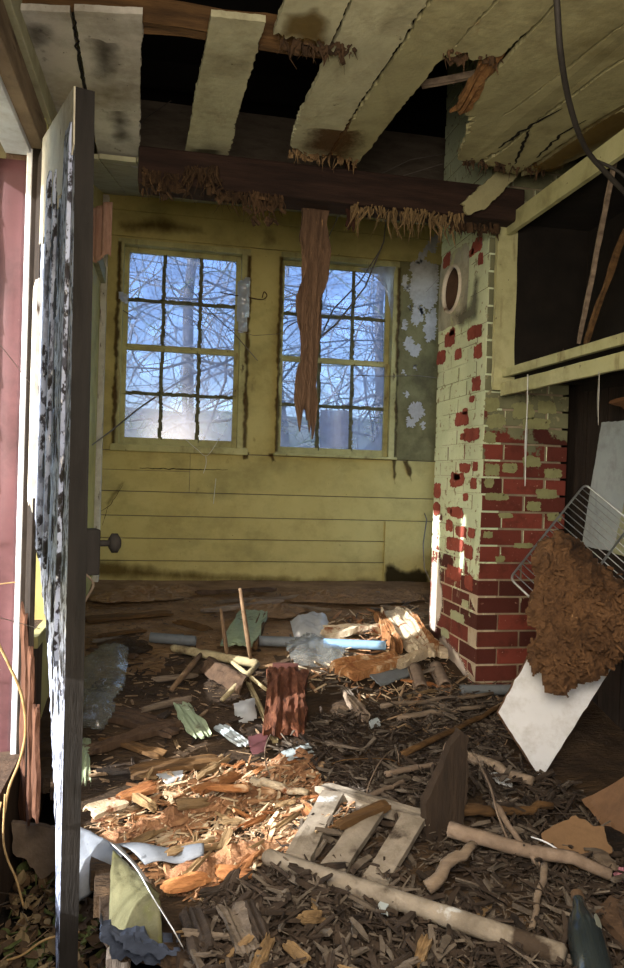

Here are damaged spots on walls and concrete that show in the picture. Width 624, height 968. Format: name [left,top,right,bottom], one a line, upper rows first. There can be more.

damp [285,13,324,41]
damp [306,122,357,156]
crack [499,109,586,164]
peeling [403,391,426,430]
peeling [455,375,557,444]
peeling [433,455,562,625]